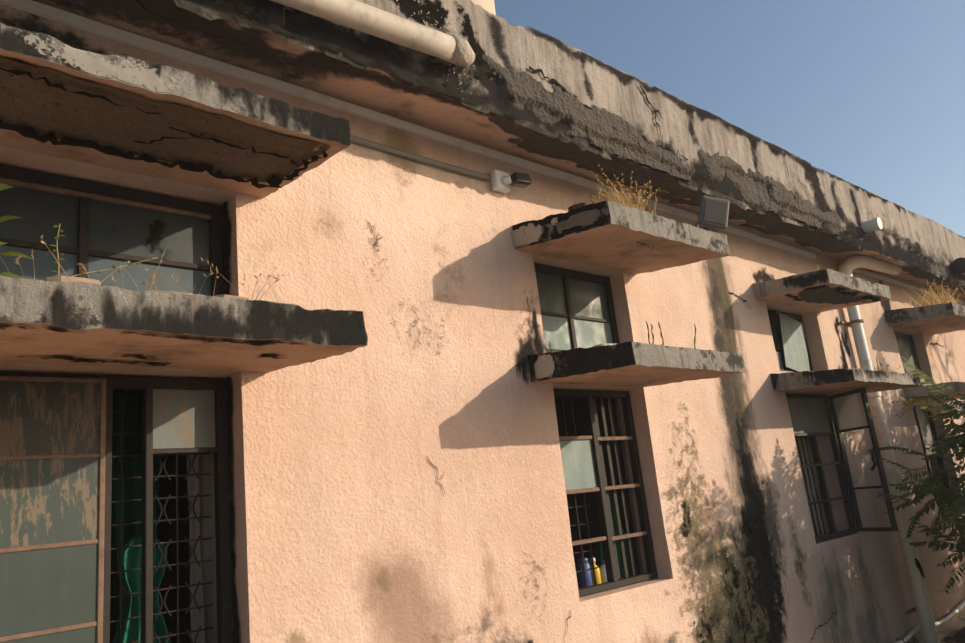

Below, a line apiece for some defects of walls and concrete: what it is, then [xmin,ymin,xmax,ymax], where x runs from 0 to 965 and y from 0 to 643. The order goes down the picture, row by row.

leakage [0,11,184,92]
spalling [0,57,331,189]
leakage [195,74,351,145]
leakage [50,0,570,132]
spalling [482,54,867,253]
leakage [516,27,932,270]
leakage [102,201,368,359]
leakage [515,300,635,383]
leakage [704,257,737,353]
leakage [753,269,891,322]
leakage [802,317,896,386]
leakage [721,373,787,643]